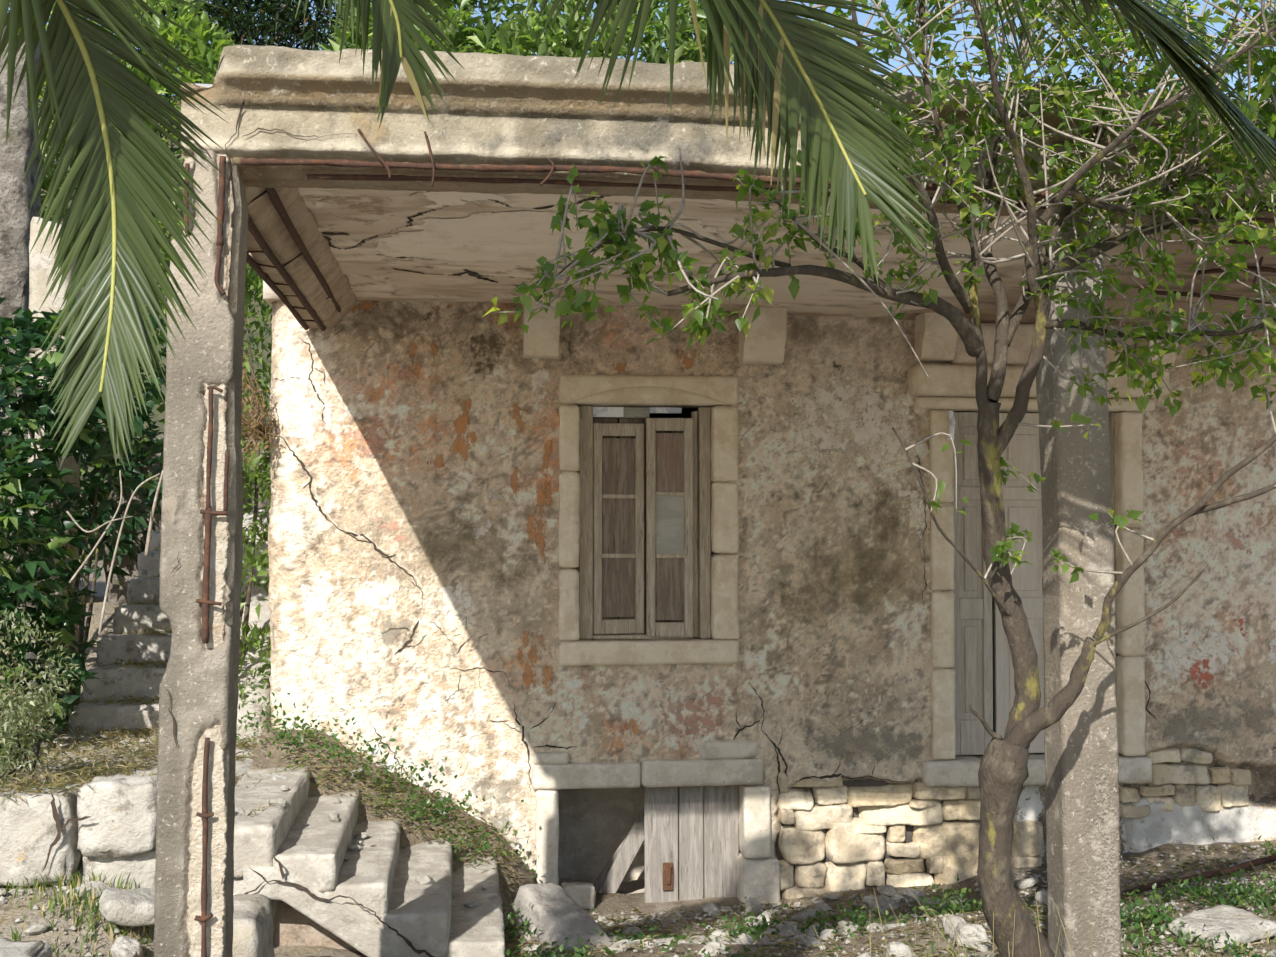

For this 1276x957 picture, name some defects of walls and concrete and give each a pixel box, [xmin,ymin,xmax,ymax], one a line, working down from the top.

crack [185,100,356,159]
crack [323,191,554,289]
peeling [214,128,801,297]
spalling [901,183,1067,209]
flaking render [300,567,400,614]
crack [272,430,578,793]
leakage [853,491,898,614]
flaking render [1161,622,1236,688]
crack [733,682,918,809]
crack [42,791,91,871]
flaking render [1085,699,1273,957]
crack [244,855,435,957]